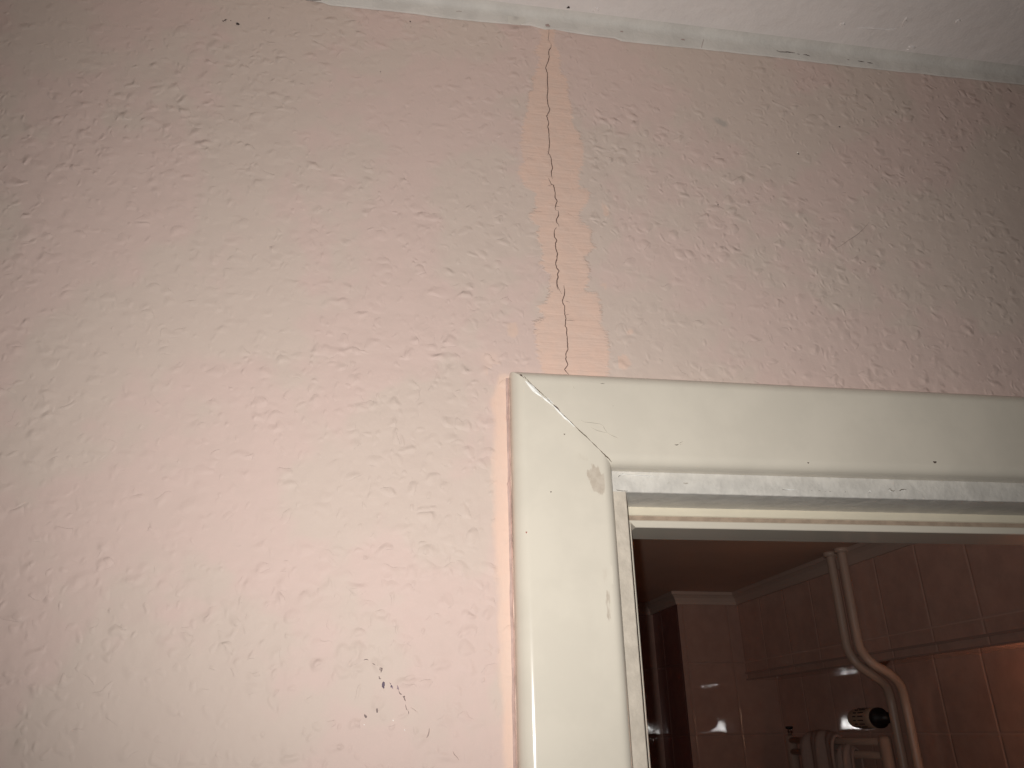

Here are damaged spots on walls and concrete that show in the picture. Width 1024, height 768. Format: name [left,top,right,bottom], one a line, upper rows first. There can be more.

crack [545,35,573,375]